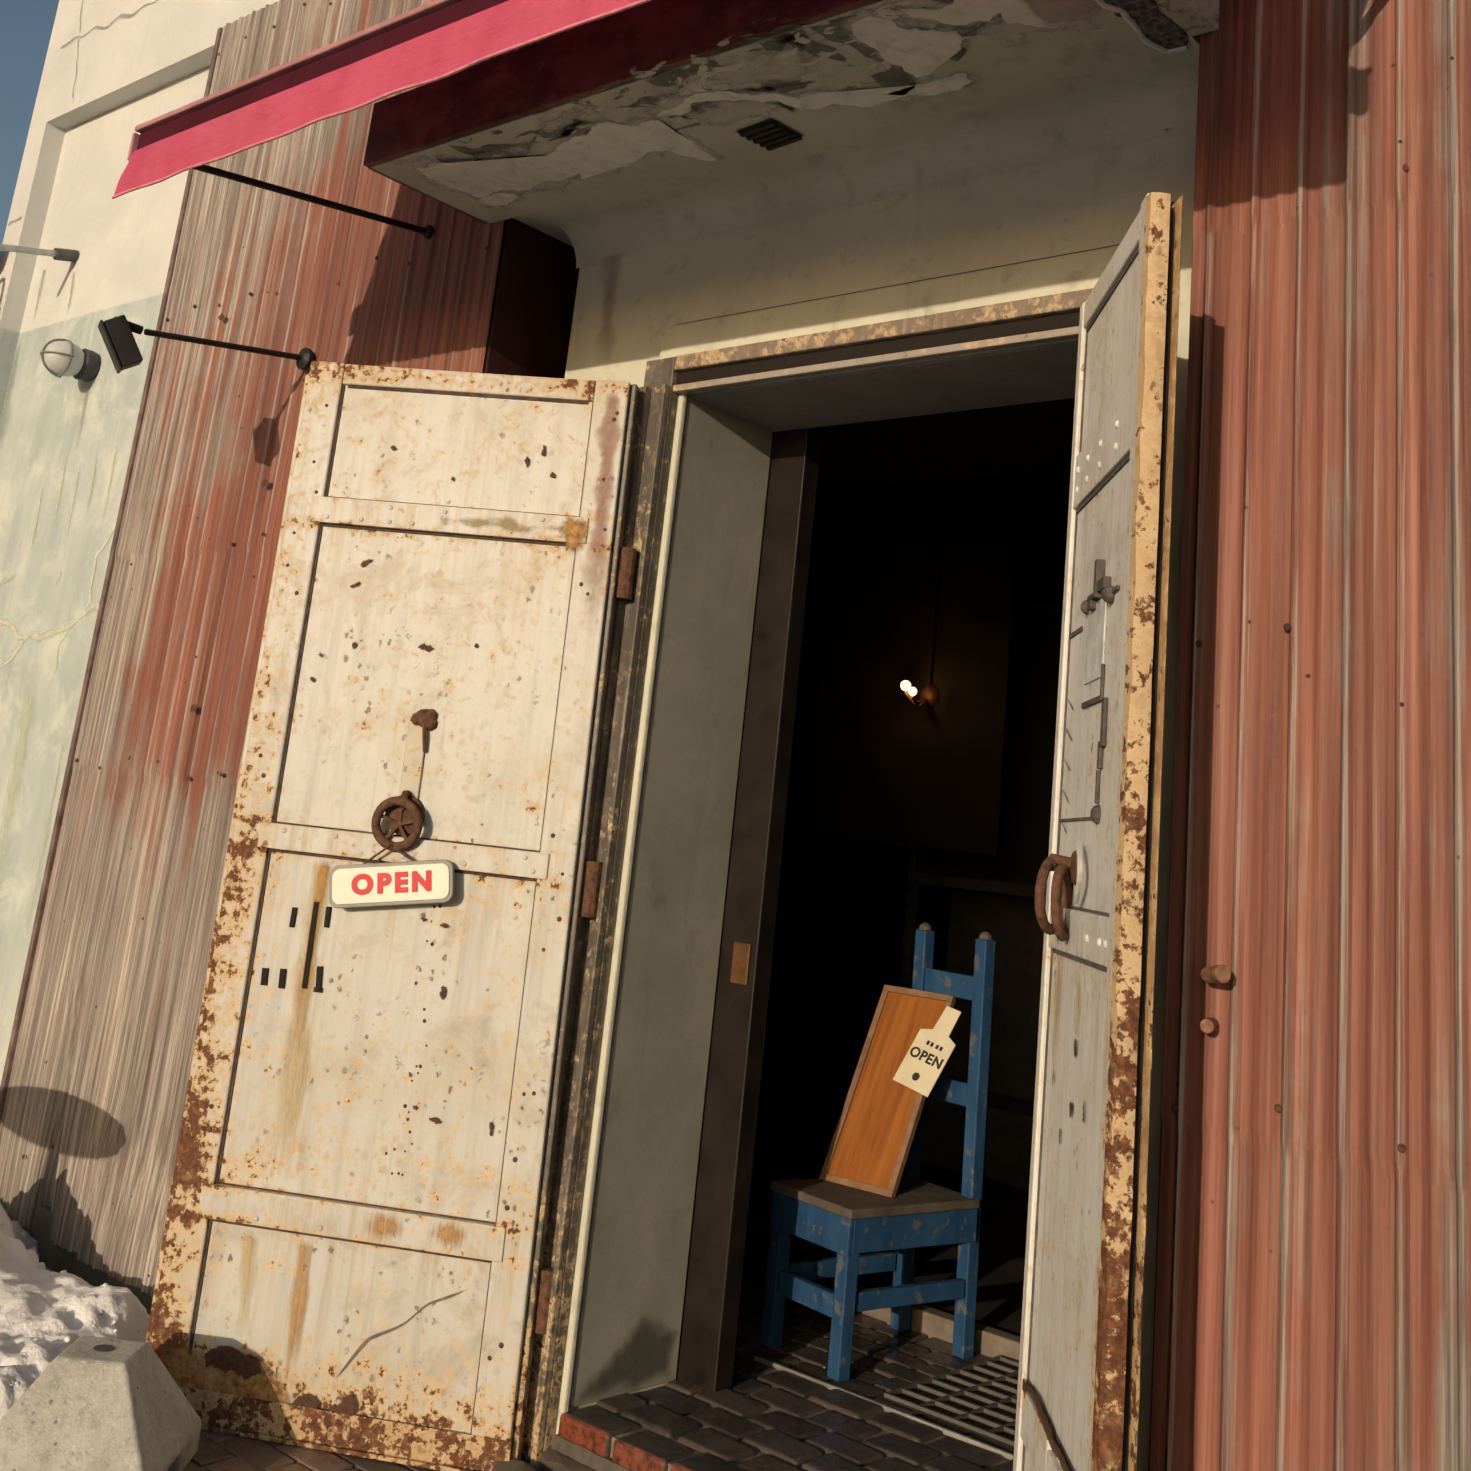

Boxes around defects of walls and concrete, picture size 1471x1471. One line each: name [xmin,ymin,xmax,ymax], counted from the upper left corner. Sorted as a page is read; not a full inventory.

crack [62,1,155,97]
peeling [402,0,1188,206]
crack [0,529,115,670]
rust [285,864,327,1110]
rust [374,1218,397,1234]
rust [437,1225,463,1243]
rust [167,1345,285,1403]
rust [288,1245,309,1352]
crack [336,1291,463,1378]